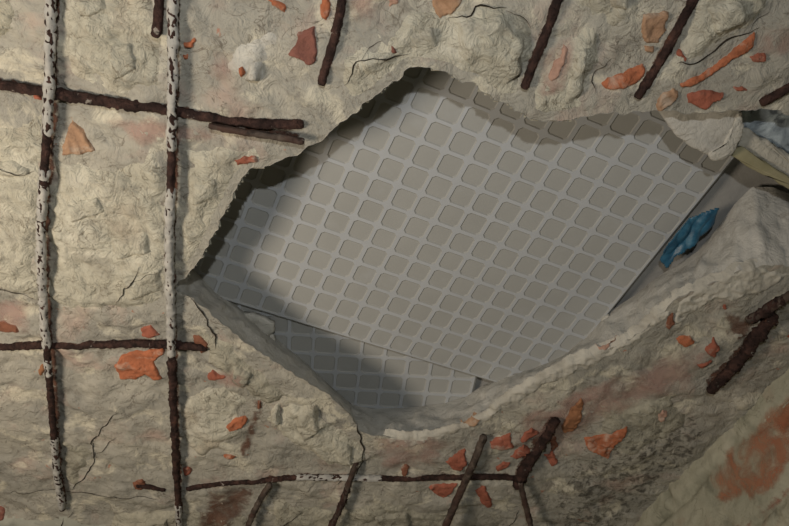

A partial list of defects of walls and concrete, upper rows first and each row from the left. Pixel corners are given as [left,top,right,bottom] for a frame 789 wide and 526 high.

spalling [318,0,347,86]
spalling [339,0,606,123]
spalling [634,0,766,100]
peeling [639,83,789,161]
spalling [0,0,305,526]
spalling [175,187,789,455]
corrosion [728,316,750,339]
corrosion [202,489,251,526]
corrosion [241,416,258,455]
spalling [186,401,561,526]
peeling [718,400,789,499]